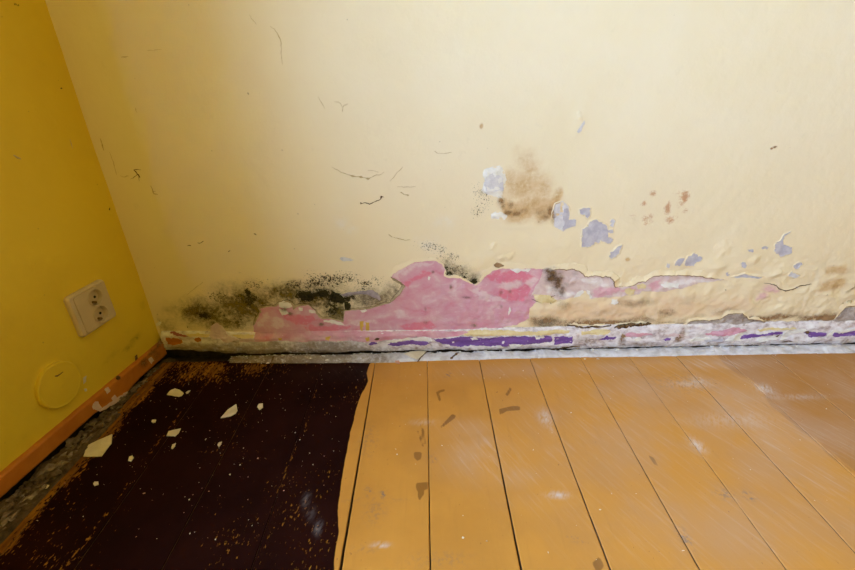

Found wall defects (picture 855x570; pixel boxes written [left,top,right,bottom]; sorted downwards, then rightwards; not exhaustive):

leakage [183,271,399,329]
leakage [404,135,577,284]
peeling [253,230,855,360]
peeling [551,200,623,260]